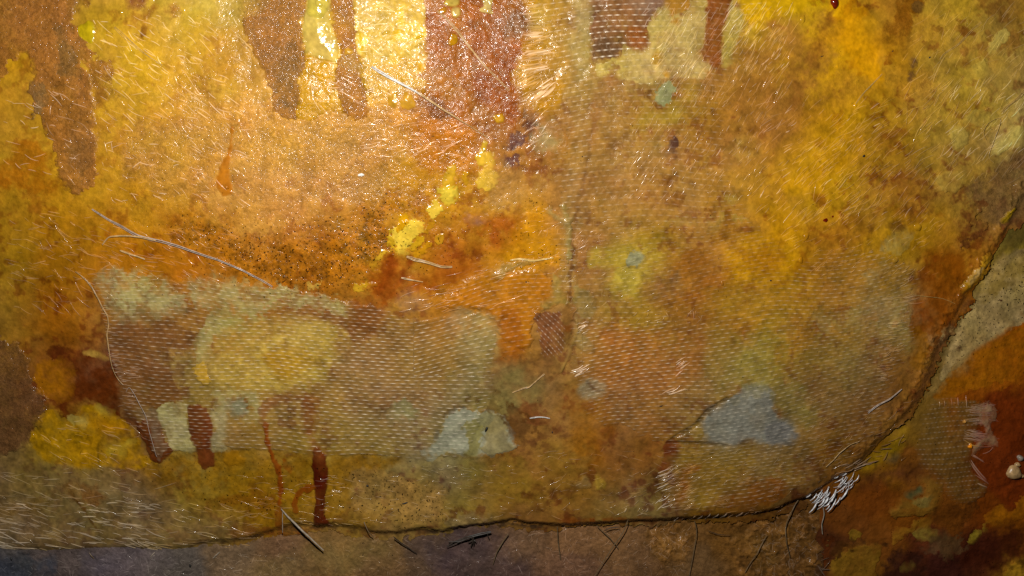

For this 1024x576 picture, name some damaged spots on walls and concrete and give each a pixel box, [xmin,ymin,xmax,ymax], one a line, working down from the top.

water stain [921,18,976,50]
rust [396,0,524,189]
rust [0,130,66,201]
water stain [650,172,687,209]
water stain [699,0,938,282]
water stain [585,238,686,309]
water stain [847,135,1024,409]
peeling [940,276,1024,382]
rust [202,485,322,539]
spalling [442,506,500,529]
peeling [829,517,934,576]
peeling [967,495,1024,543]